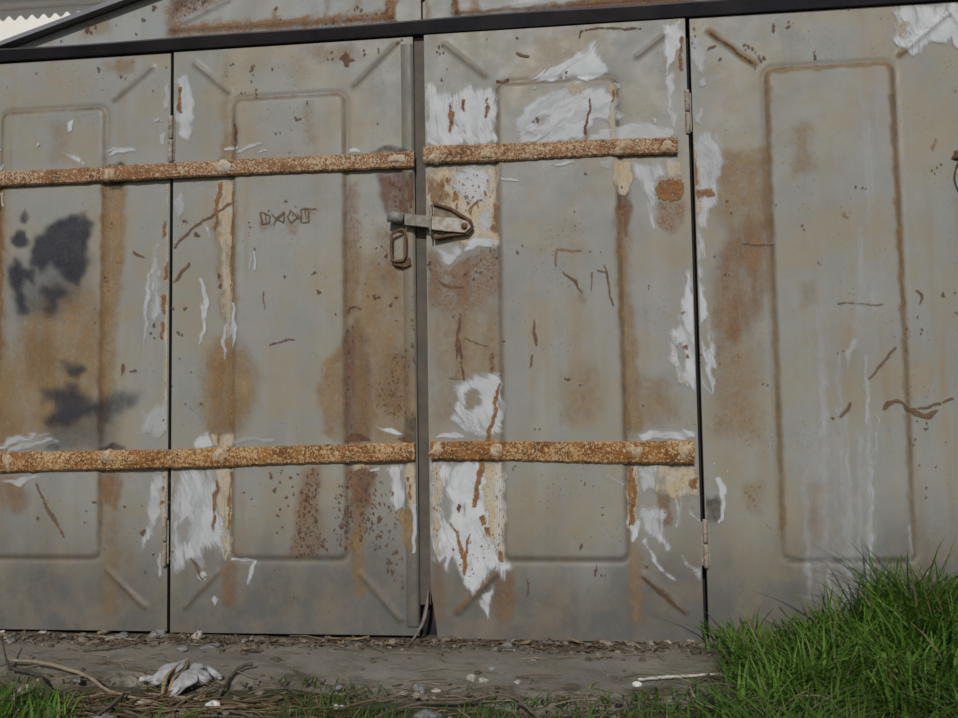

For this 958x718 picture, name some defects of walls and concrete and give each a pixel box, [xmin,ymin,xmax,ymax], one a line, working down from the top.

rust [168,0,398,35]
rust [451,0,509,16]
rust [527,0,690,11]
peeling [448,99,466,133]
rust [379,172,414,213]
peeling [695,163,716,199]
peeling [490,204,499,232]
peeling [485,384,501,441]
peeling [211,471,232,532]
peeling [456,460,490,536]
rust [269,467,404,589]